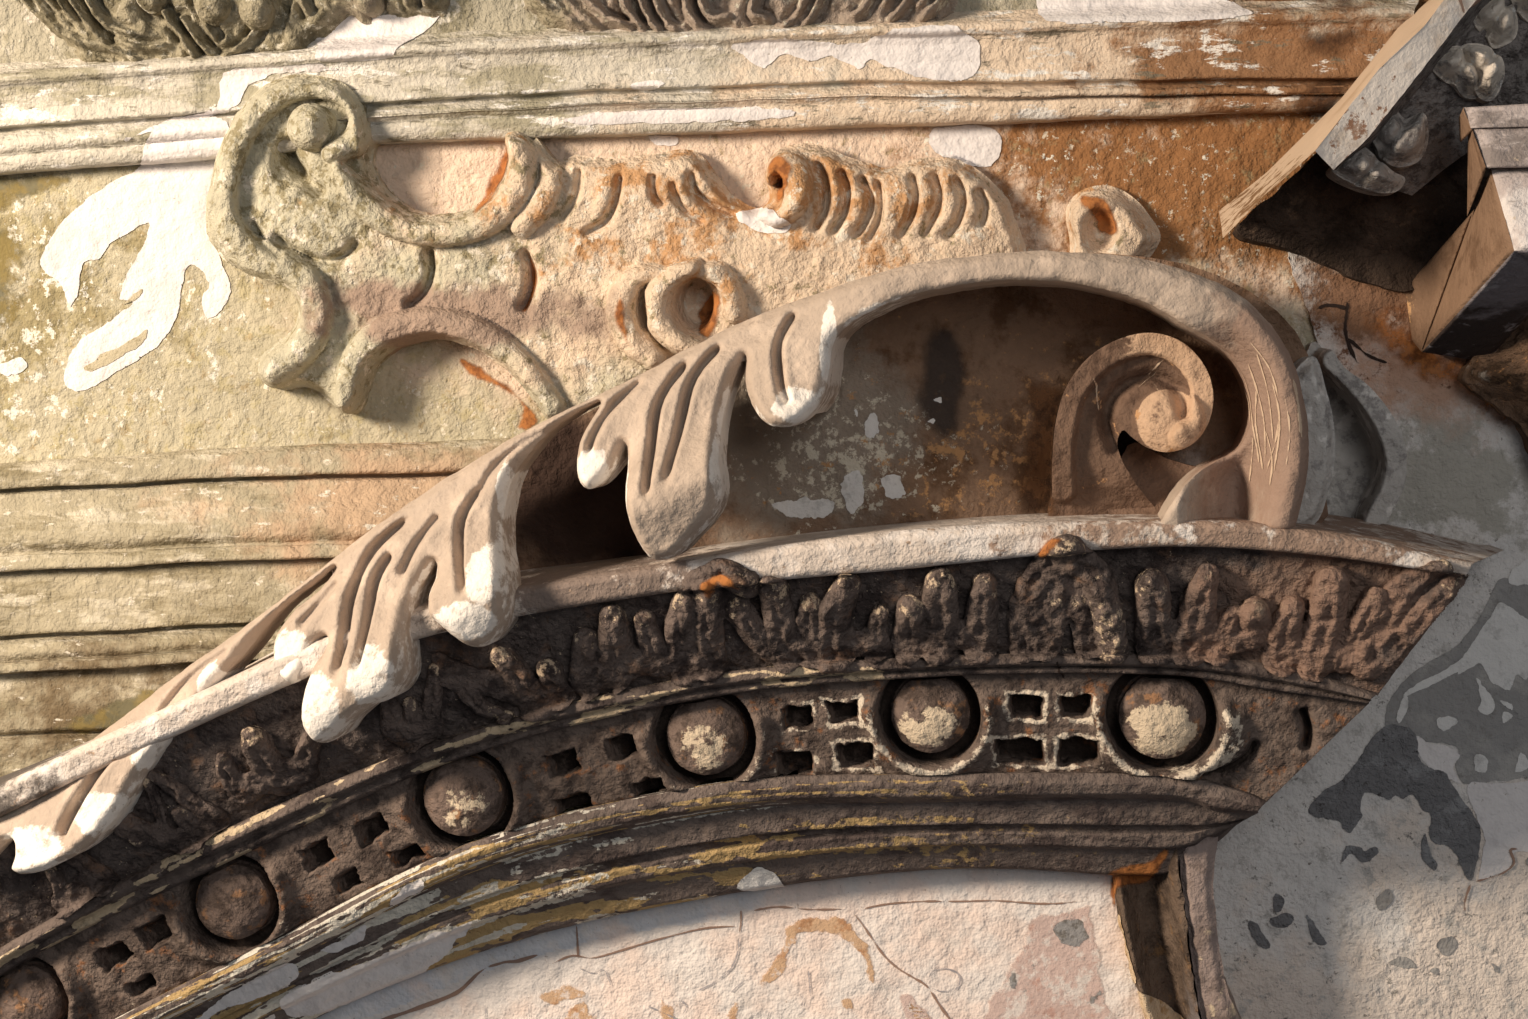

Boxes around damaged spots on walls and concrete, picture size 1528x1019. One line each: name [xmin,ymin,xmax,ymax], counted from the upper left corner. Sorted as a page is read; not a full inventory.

peeling [1036,0,1253,24]
peeling [731,24,980,82]
peeling [563,106,795,146]
peeling [40,14,439,392]
corrosion [475,149,508,210]
corrosion [1081,196,1117,235]
corrosion [523,259,536,311]
corrosion [460,359,537,429]
spalling [1308,578,1528,881]
peeling [196,922,472,1019]
peeling [761,916,874,985]
peeling [986,907,1114,1019]